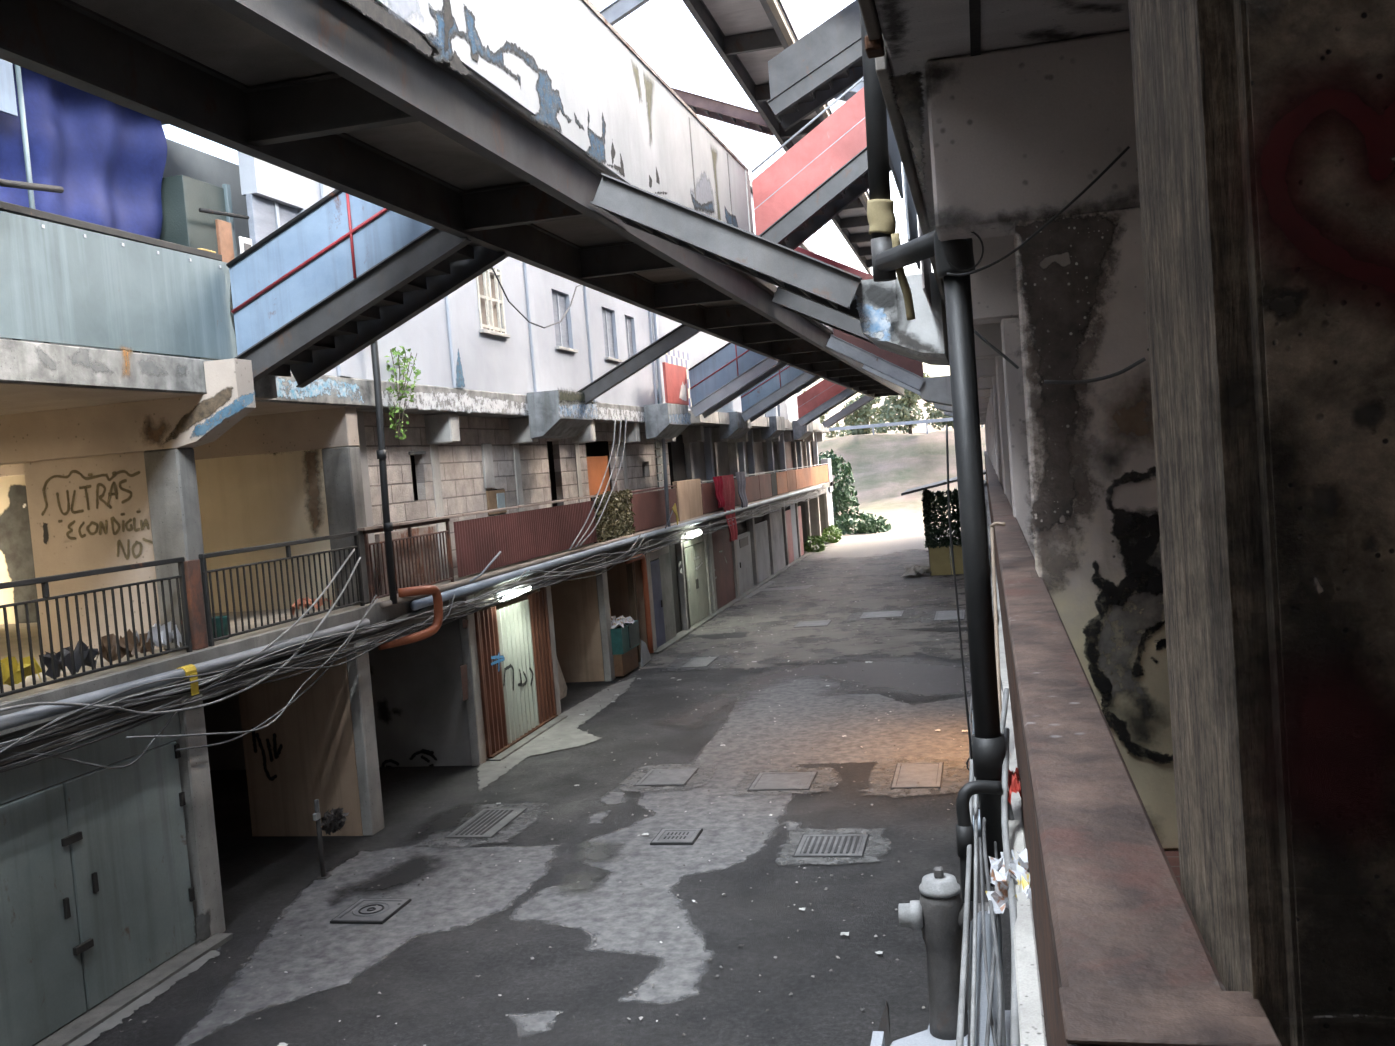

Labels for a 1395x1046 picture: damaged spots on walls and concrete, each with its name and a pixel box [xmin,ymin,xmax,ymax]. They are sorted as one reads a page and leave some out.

peeling [690,191,739,228]
spalling [166,387,255,442]
damp [304,449,321,533]